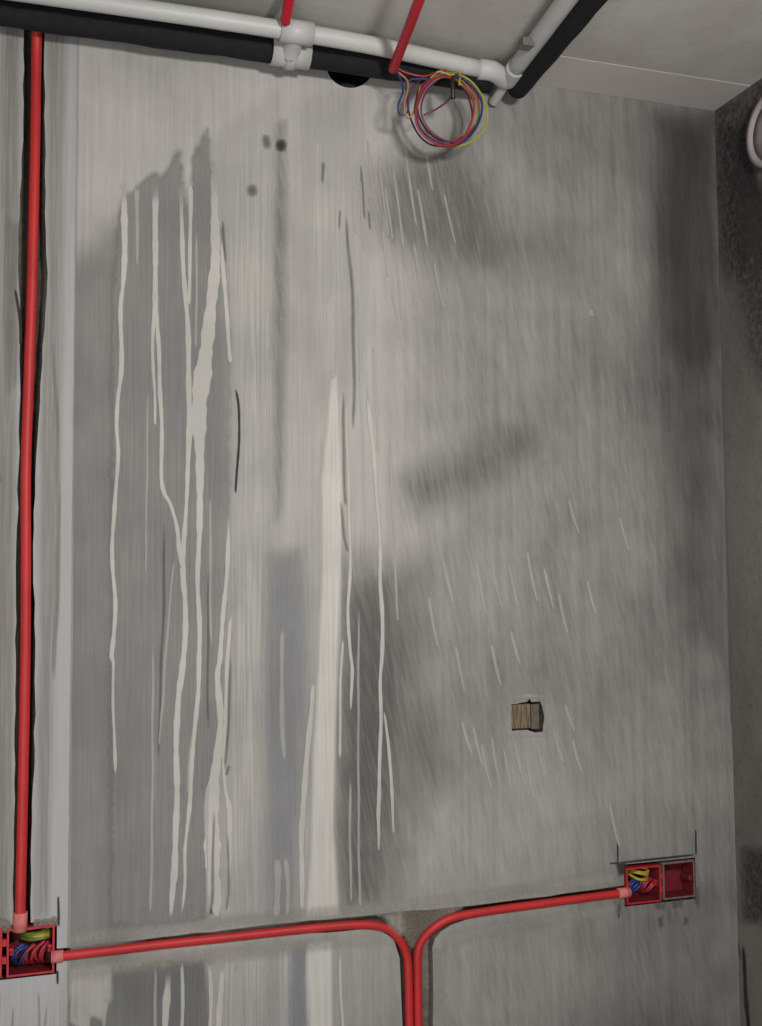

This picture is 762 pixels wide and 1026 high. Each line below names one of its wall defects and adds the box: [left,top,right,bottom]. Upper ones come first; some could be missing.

damp [70,106,433,950]
damp [527,553,568,633]
damp [69,953,265,1026]
damp [279,941,345,1026]